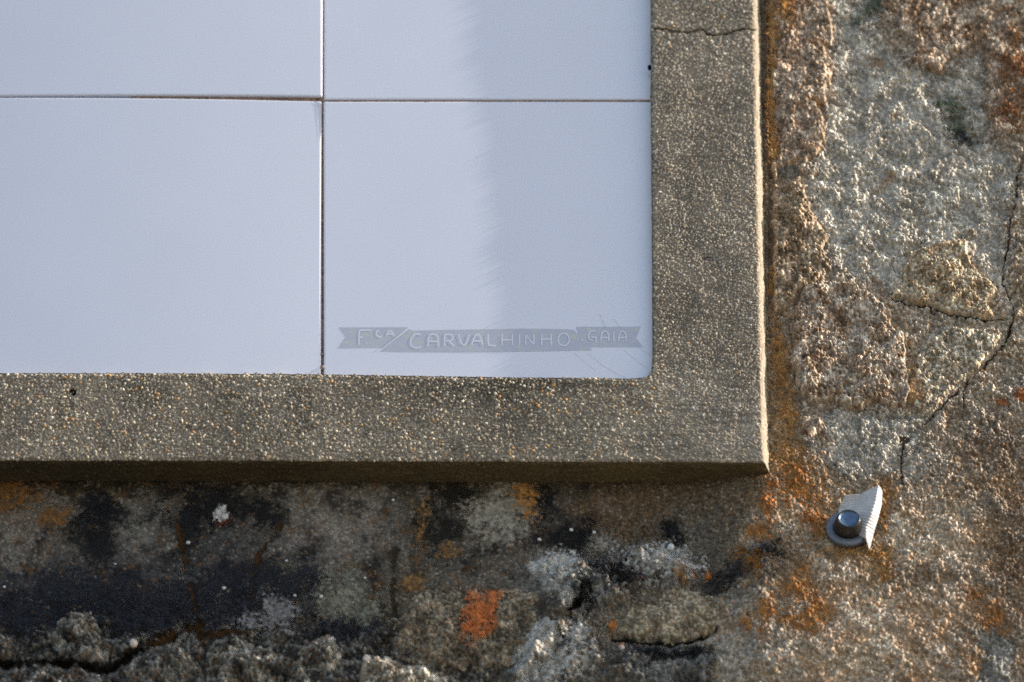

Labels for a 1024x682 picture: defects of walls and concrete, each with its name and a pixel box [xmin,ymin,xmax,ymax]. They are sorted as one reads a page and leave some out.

crack [661,28,757,36]
crack [891,165,1021,485]
leakage [0,481,399,649]
leakage [411,482,789,682]